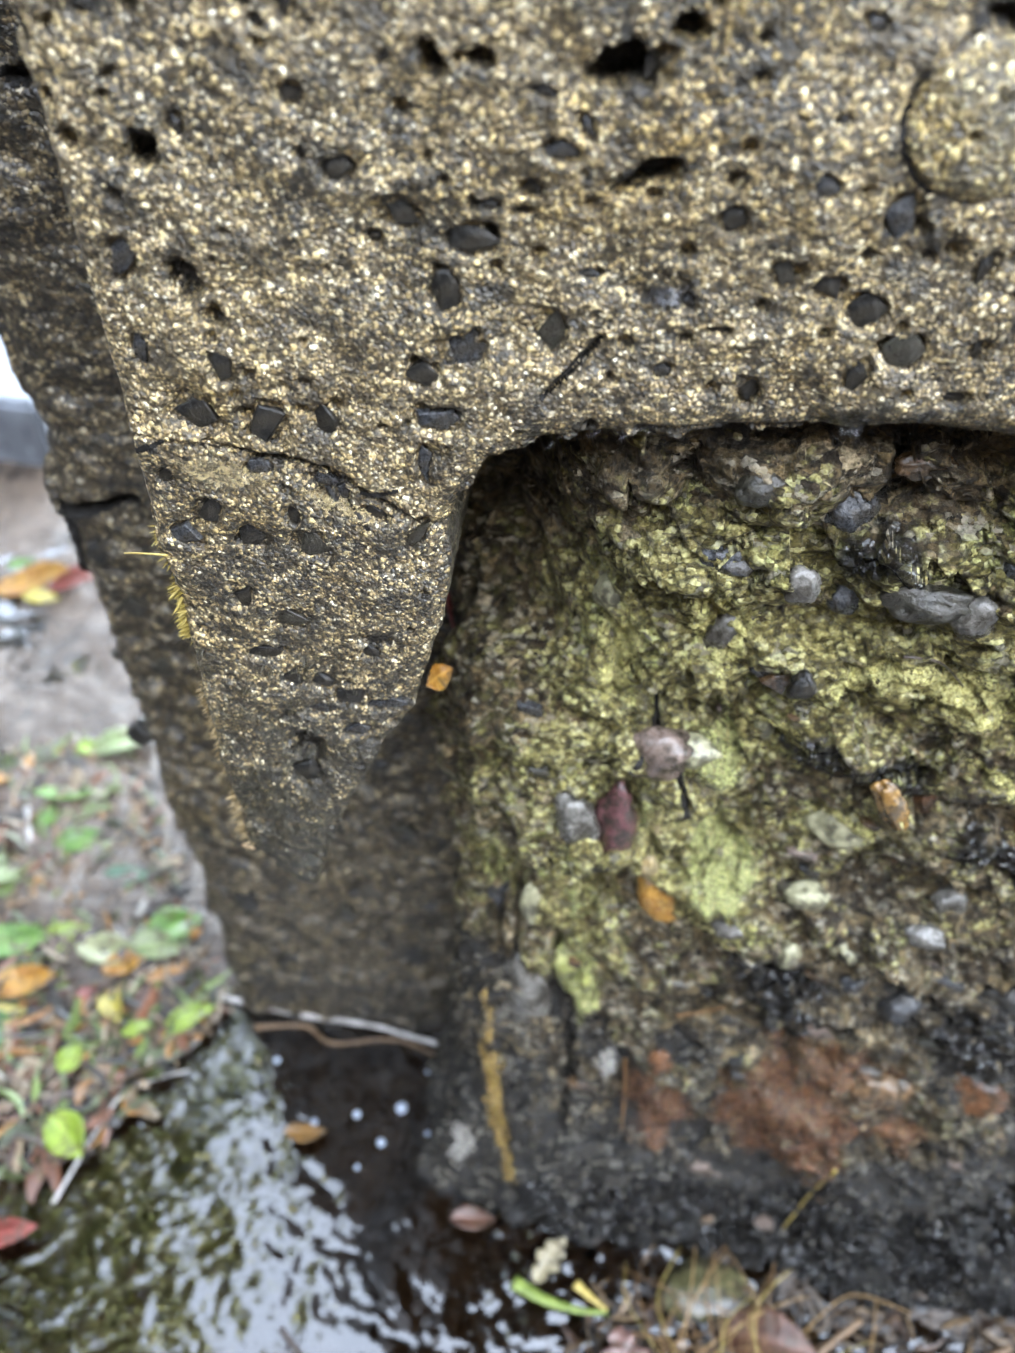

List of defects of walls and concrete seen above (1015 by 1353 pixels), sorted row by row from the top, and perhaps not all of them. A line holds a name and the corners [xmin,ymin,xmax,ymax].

crack [540,335,604,401]
crack [134,439,164,454]
crack [324,484,398,531]
spalling [417,421,1015,1319]
corrosion [763,1027,903,1096]
corrosion [874,1112,924,1157]